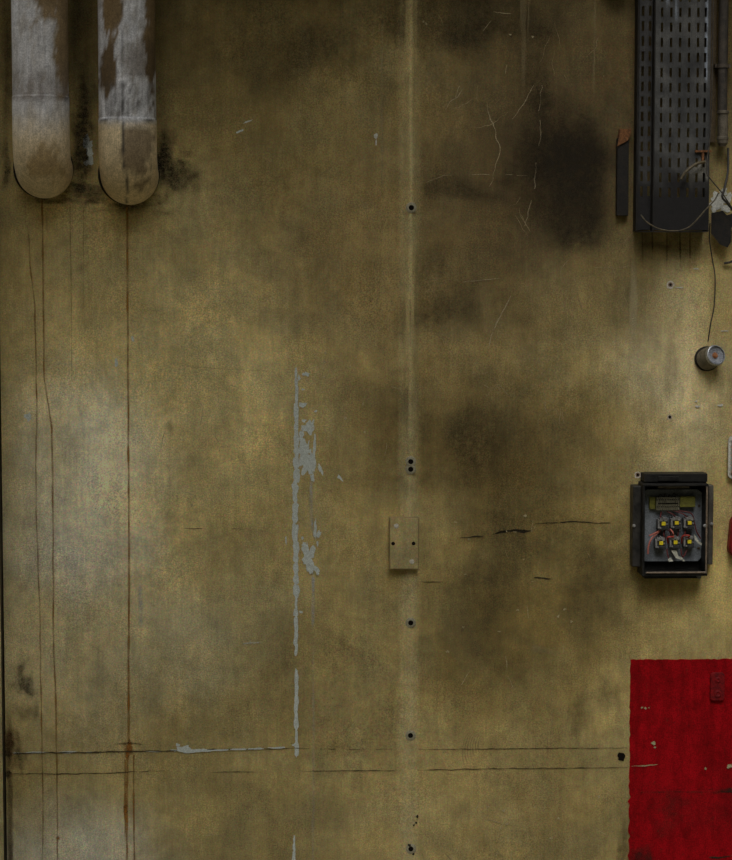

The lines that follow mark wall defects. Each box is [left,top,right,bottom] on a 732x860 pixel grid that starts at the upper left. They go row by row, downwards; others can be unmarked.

crack [445,30,570,234]
corrosion [34,288,53,471]
peeling [285,367,323,656]
corrosion [121,481,139,860]
peeling [172,669,299,757]